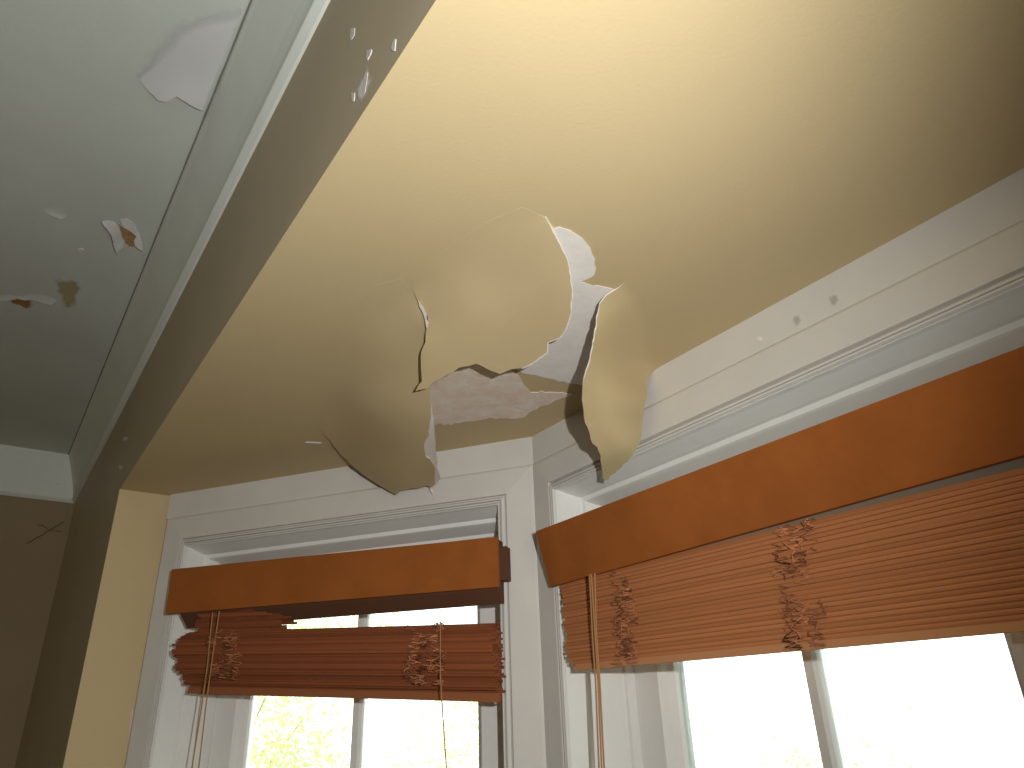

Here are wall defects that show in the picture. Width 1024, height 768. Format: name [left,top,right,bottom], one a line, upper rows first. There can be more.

peeling [139,15,240,110]
spalling [351,49,372,102]
peeling [102,218,143,253]
water stain [59,282,78,306]
peeling [300,207,664,495]